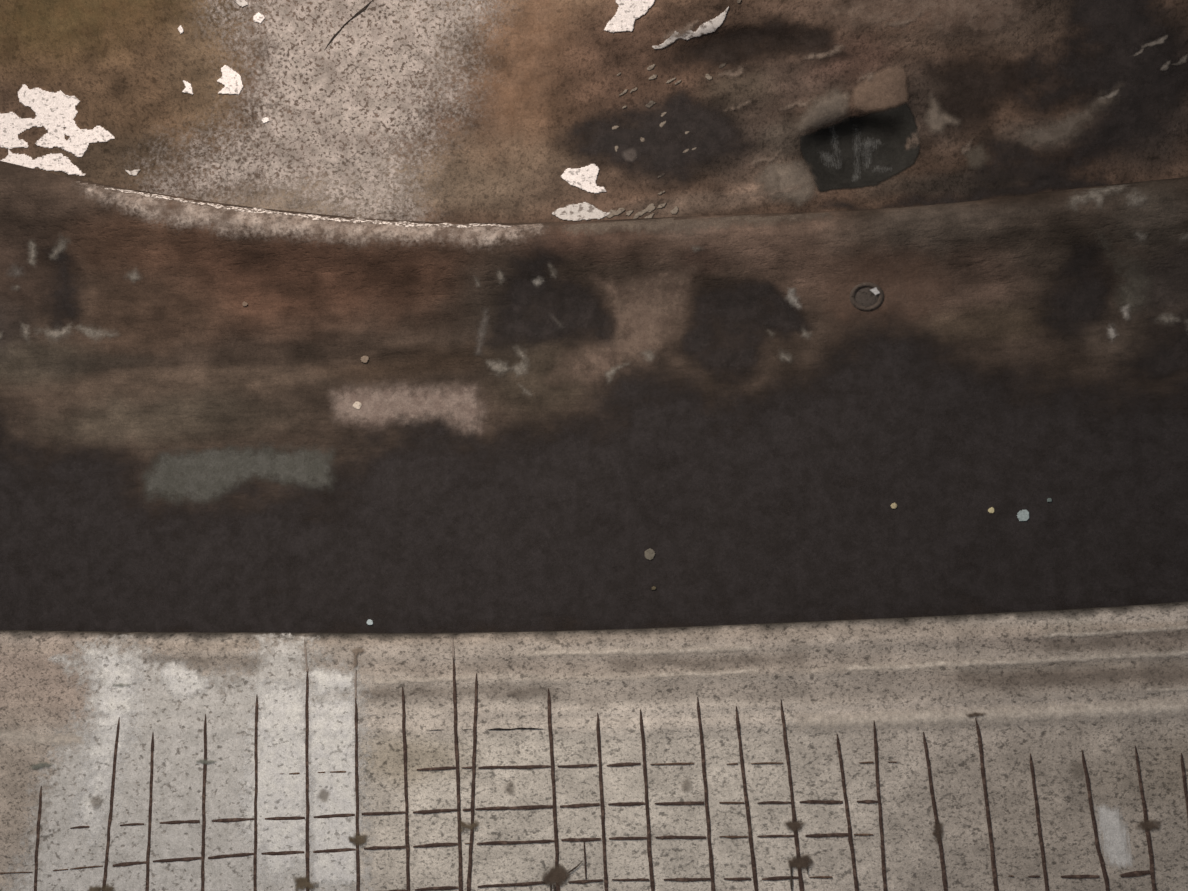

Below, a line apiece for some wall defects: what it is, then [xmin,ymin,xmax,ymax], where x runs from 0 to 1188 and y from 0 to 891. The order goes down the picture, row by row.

peeling [604,0,655,33]
peeling [652,0,741,49]
peeling [0,84,115,176]
peeling [552,164,679,221]
flaking render [774,162,814,204]
damp [1072,185,1144,205]
damp [477,311,526,375]
crack [463,724,560,732]
corrosion [543,861,582,891]